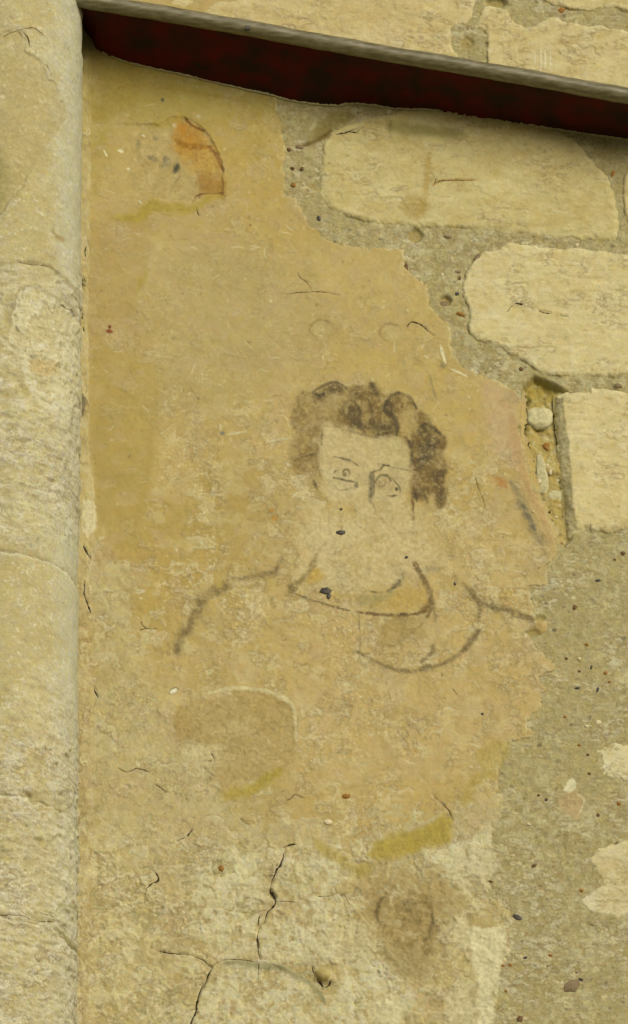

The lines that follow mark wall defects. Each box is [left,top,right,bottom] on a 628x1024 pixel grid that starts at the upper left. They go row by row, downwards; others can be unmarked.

rust [166,114,230,204]
peeling [562,772,591,792]
crack [152,843,359,1024]
flaking render [350,841,522,1024]